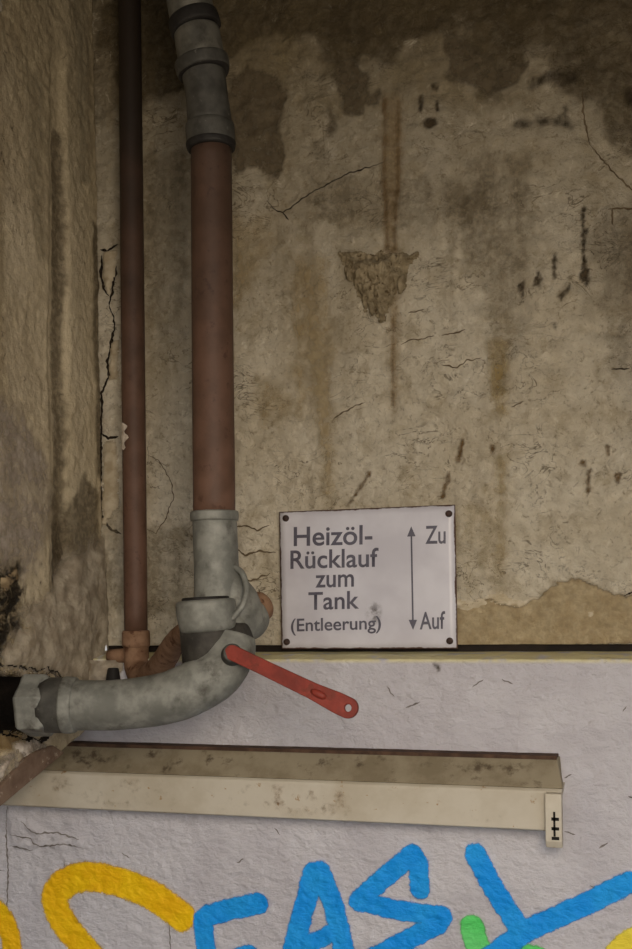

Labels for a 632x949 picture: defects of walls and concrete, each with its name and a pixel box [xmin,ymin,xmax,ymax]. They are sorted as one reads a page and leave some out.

leakage [50,133,64,377]
crack [268,162,384,220]
crack [582,91,632,225]
crack [99,244,121,534]
leakage [0,392,98,654]
spalling [457,578,632,645]